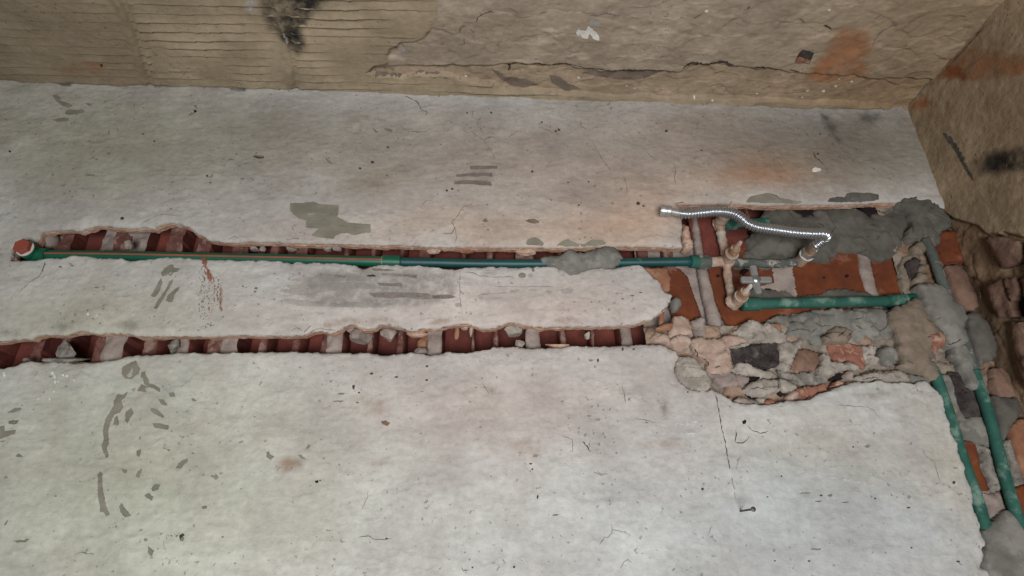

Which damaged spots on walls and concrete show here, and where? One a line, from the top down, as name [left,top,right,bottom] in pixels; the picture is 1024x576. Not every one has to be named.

water stain [267,0,320,49]
rust [198,258,222,319]